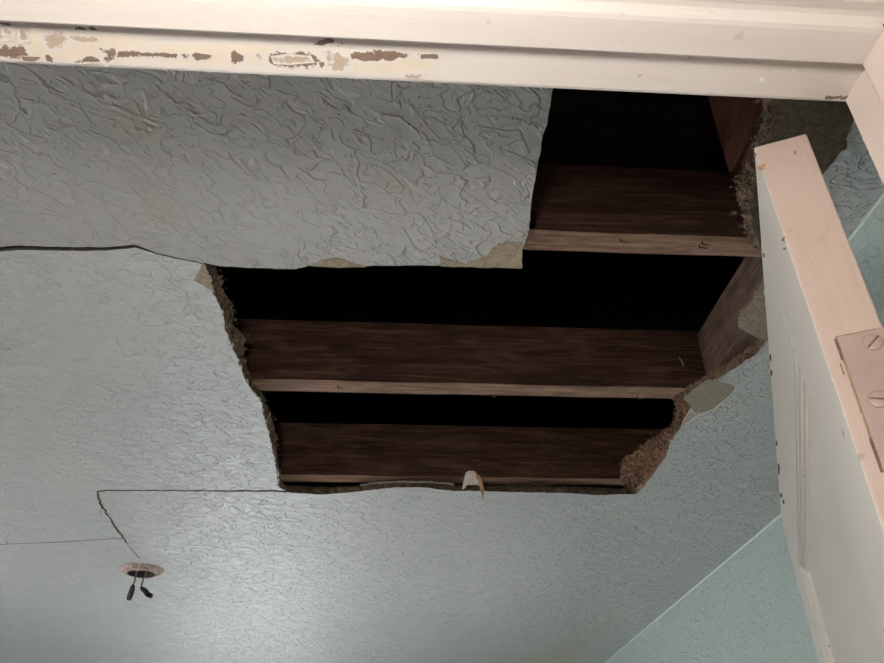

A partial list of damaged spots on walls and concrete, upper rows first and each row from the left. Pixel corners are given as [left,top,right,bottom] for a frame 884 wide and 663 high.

peeling [0,21,444,80]
crack [0,246,203,264]
flaking render [311,258,367,268]
flaking render [440,242,523,268]
flaking render [681,379,735,426]
crack [0,490,288,559]